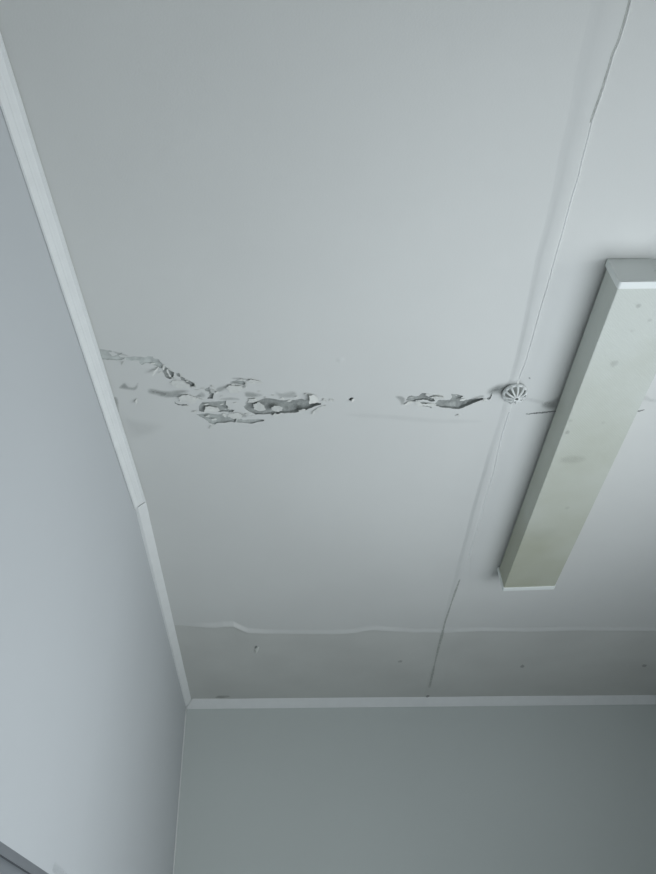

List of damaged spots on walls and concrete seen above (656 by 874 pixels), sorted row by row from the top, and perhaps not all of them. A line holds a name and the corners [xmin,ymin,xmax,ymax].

crack [518,0,631,380]
peeling [100,349,334,429]
peeling [404,393,492,416]
crack [428,579,461,688]